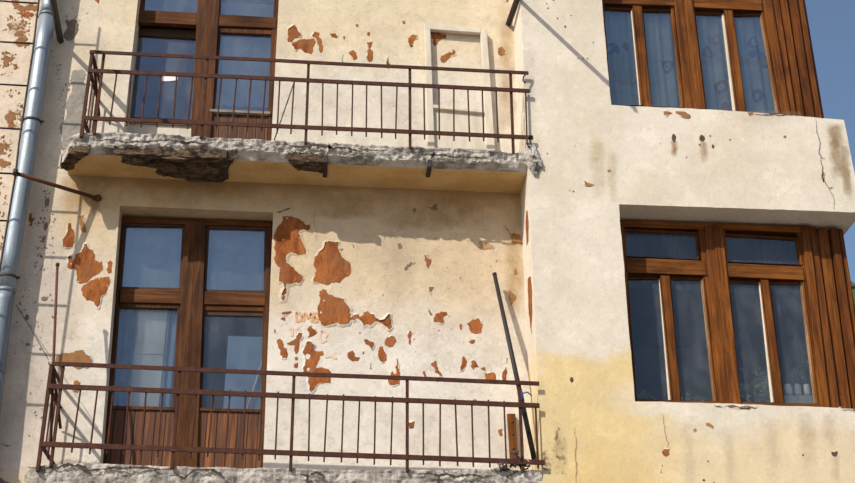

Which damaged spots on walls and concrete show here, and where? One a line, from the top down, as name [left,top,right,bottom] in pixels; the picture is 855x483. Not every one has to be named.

peeling [0,0,39,75]
peeling [287,24,345,54]
peeling [0,89,23,245]
spalling [60,143,91,171]
spalling [113,145,237,183]
crack [816,121,835,203]
leakage [830,126,849,188]
peeling [15,188,113,358]
peeling [274,214,416,394]
peeling [429,310,483,344]
crack [300,471,326,483]
crack [414,472,492,483]